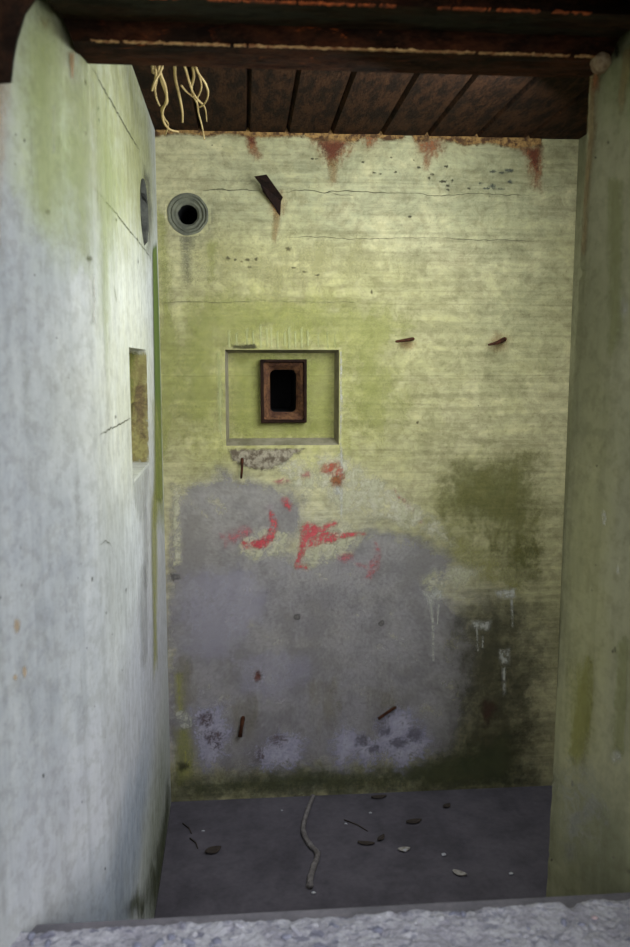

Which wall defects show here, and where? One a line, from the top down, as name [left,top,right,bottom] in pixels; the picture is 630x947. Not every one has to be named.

corrosion [319,138,351,165]
crack [205,188,517,196]
corrosion [521,147,542,180]
damp [152,244,163,663]
damp [169,472,527,781]
flaking render [176,706,232,768]